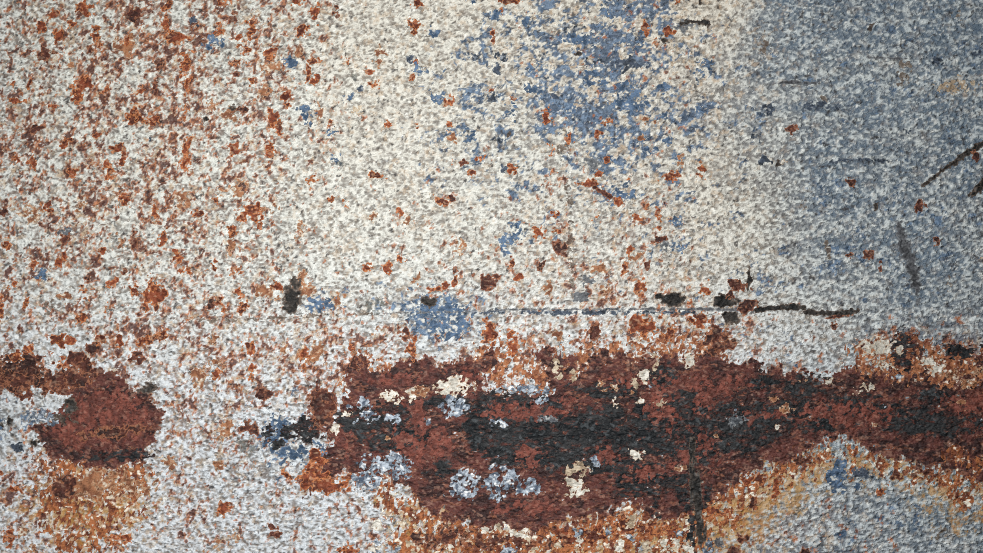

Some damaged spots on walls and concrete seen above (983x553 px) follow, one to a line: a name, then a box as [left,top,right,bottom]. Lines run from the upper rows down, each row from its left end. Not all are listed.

corrosion [36,0,144,105]
corrosion [117,0,194,126]
corrosion [212,0,332,163]
corrosion [102,141,126,181]
corrosion [53,268,169,313]
corrosion [207,179,280,276]
corrosion [206,280,284,316]
corrosion [407,237,467,294]
corrosion [472,256,524,292]
corrosion [532,210,568,257]
corrosion [620,201,668,298]
corrosion [280,279,983,553]